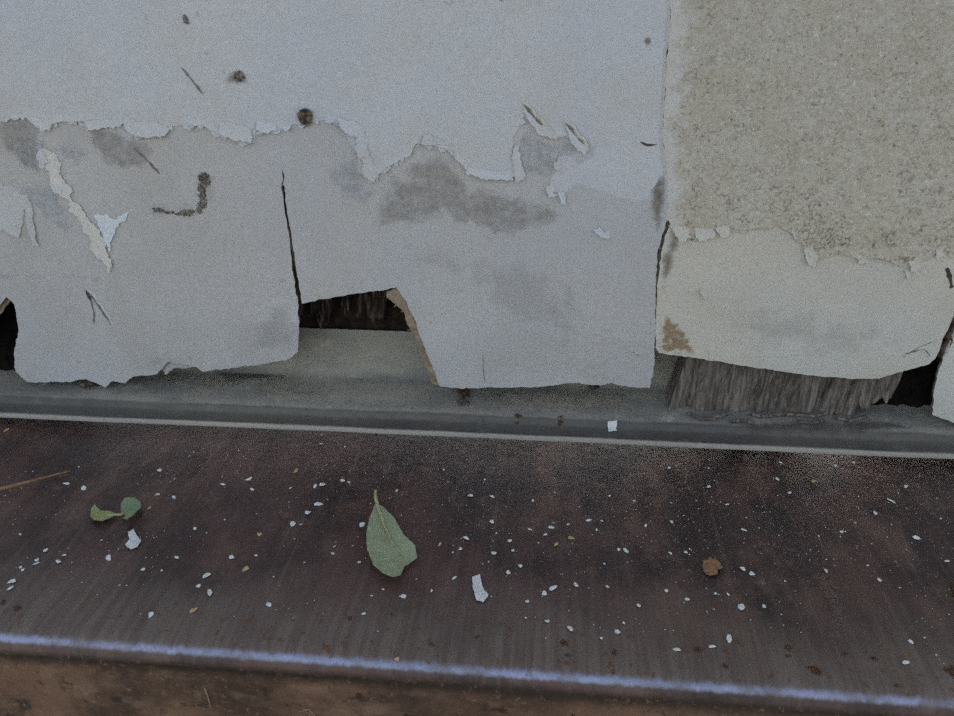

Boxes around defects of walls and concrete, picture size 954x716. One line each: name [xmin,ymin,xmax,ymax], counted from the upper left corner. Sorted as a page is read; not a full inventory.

peeling [0,0,671,205]
peeling [0,185,39,247]
peeling [36,148,132,273]
spalling [152,172,210,216]
crack [281,171,303,315]
spalling [386,287,439,385]
rust [663,320,691,351]
crack [902,311,954,359]